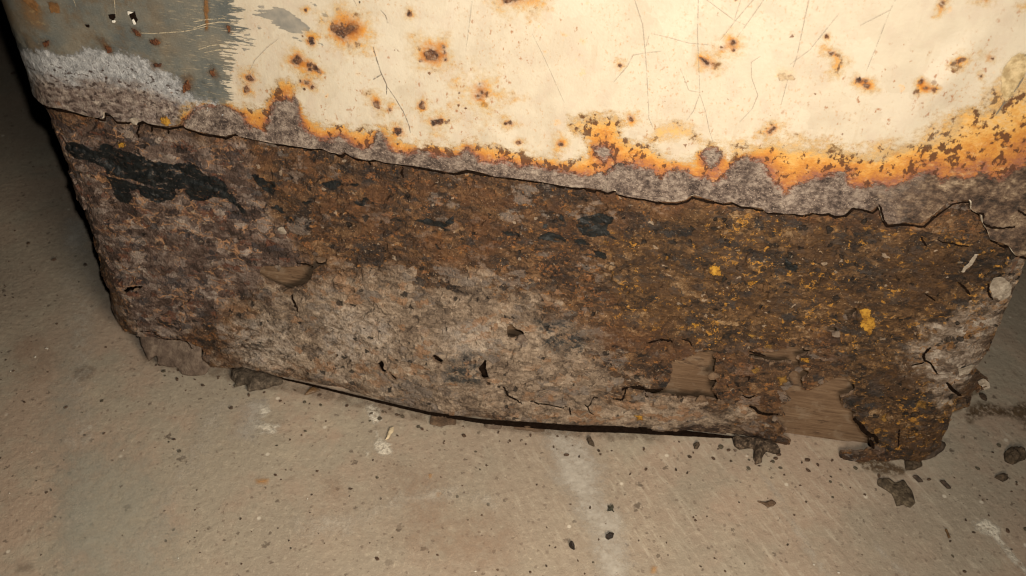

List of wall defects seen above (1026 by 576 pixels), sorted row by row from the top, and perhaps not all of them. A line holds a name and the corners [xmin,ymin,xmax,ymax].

corrosion [17,0,1026,256]
crack [44,105,1026,259]
corrosion [858,308,876,335]
spalling [666,350,725,405]
spalling [753,347,869,455]